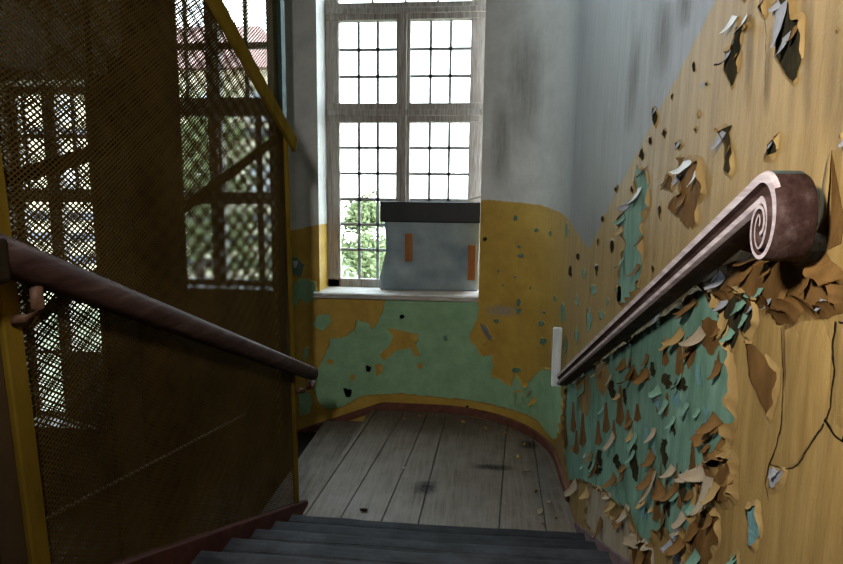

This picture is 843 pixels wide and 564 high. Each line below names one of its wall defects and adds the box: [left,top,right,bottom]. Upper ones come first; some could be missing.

peeling [714,15,752,90]
peeling [757,0,806,87]
peeling [297,105,843,564]
crack [765,321,843,497]